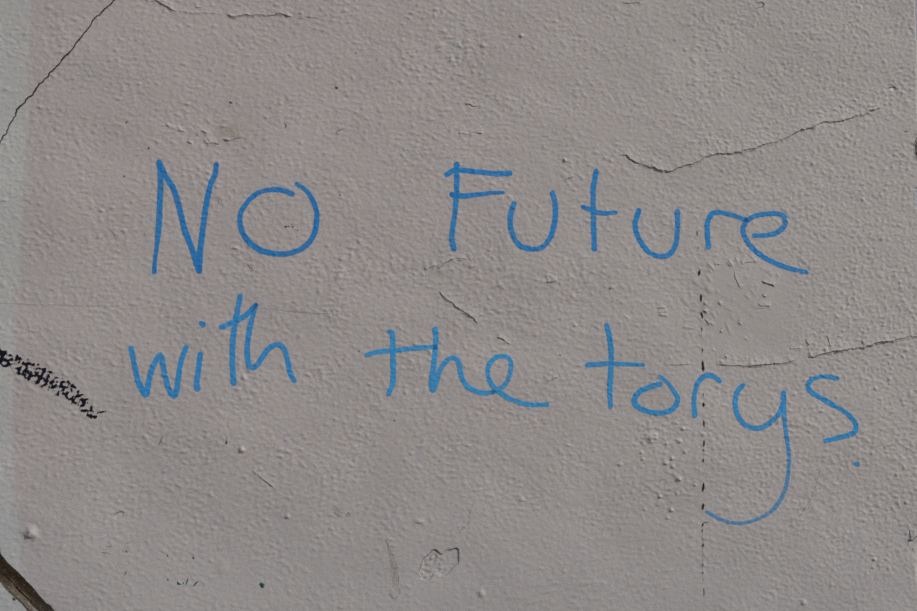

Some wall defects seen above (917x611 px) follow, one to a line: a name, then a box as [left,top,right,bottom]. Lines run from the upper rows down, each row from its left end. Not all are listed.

crack [0,0,115,143]
crack [145,0,319,19]
crack [615,90,889,173]
crack [663,232,917,371]